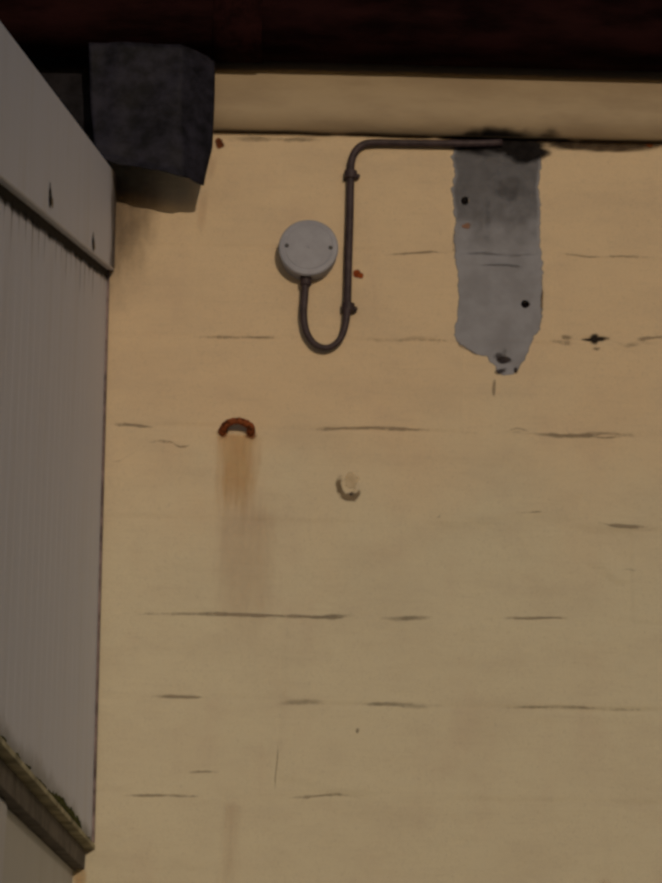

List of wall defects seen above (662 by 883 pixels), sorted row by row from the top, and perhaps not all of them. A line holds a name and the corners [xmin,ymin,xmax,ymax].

water stain [439,128,571,162]
peeling [451,147,543,375]
spalling [336,472,360,501]